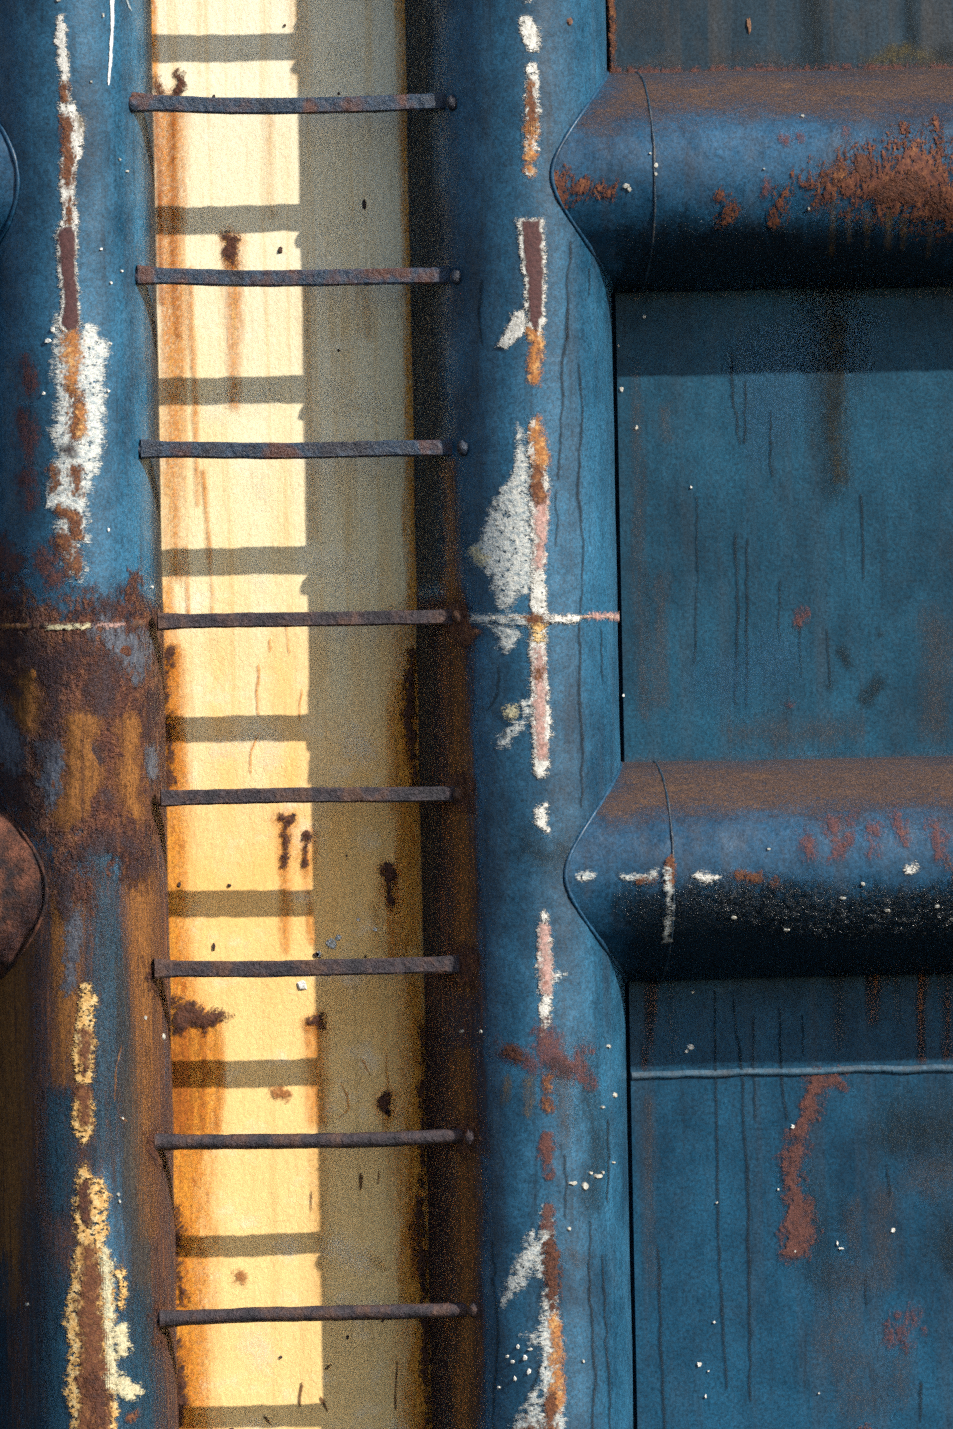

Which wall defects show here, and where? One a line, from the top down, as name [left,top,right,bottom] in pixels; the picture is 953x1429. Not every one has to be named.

corrosion [151,0,188,96]
peeling [518,0,543,178]
corrosion [583,0,953,247]
peeling [42,0,112,583]
corrosion [220,230,242,270]
peeling [497,217,548,386]
peeling [465,413,619,779]
corrosion [0,458,235,1429]
corrosion [277,812,313,951]
corrosion [379,457,598,1429]
peeling [61,982,145,1429]
peeling [497,1203,571,1429]